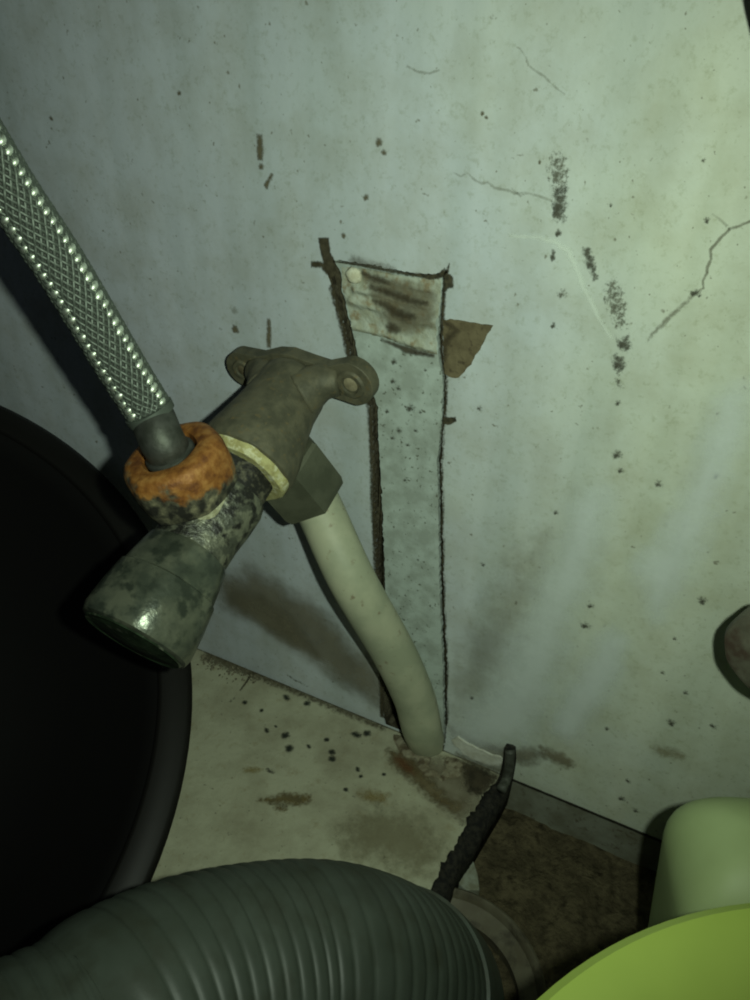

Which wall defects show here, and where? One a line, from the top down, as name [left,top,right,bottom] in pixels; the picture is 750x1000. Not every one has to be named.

leakage [549,158,568,219]
leakage [584,248,598,280]
crack [664,221,750,322]
peeling [342,267,493,378]
leakage [604,282,626,327]
leakage [614,336,630,383]